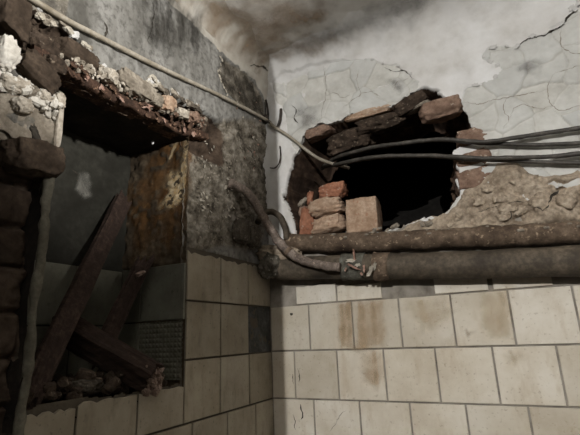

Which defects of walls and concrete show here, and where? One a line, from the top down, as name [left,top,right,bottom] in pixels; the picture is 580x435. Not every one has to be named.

peeling [34,7,93,52]
peeling [145,74,202,113]
peeling [273,58,419,154]
crack [468,5,580,129]